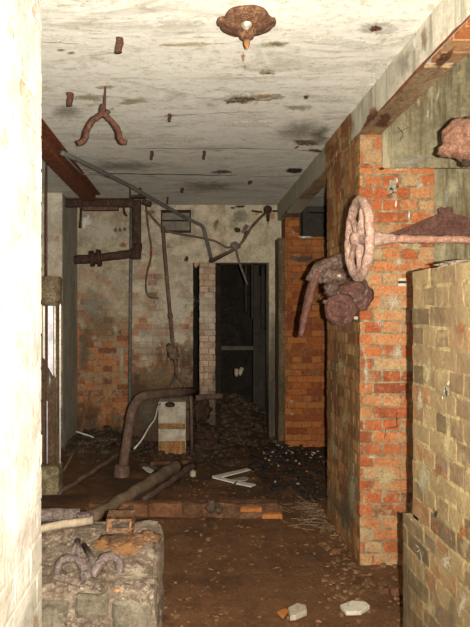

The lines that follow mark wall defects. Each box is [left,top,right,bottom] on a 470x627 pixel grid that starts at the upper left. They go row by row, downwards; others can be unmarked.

spalling [222,94,286,105]
corrosion [361,15,470,130]